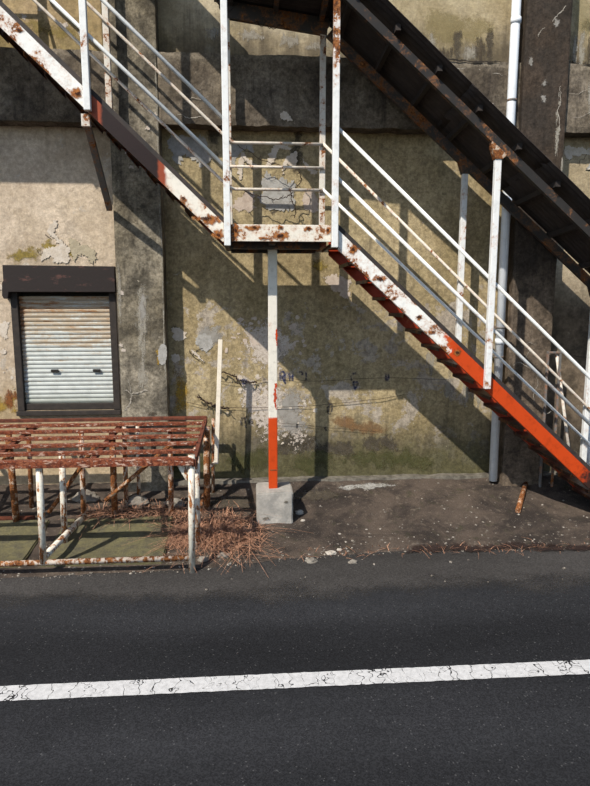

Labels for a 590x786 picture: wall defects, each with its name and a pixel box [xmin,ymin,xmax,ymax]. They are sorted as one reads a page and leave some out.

damp [430,28,494,62]
damp [569,19,590,64]
peeling [167,135,212,168]
peeling [563,145,590,170]
peeling [232,140,319,213]
rust [193,214,224,239]
damp [277,431,356,457]